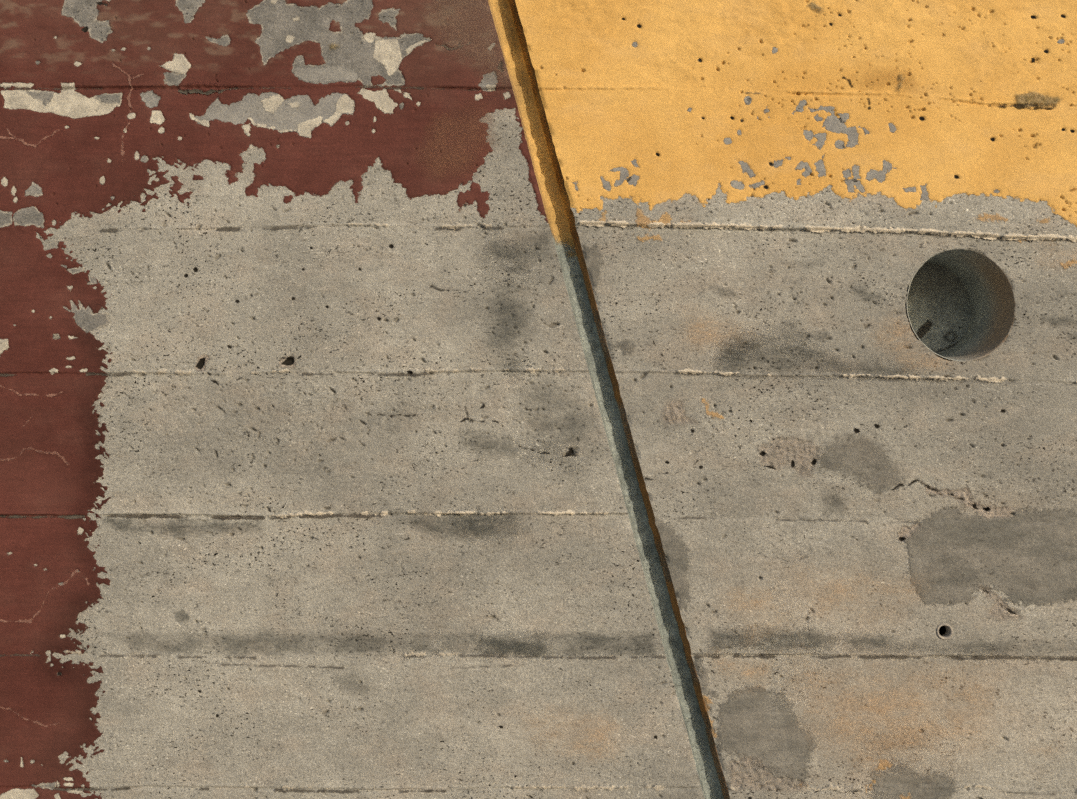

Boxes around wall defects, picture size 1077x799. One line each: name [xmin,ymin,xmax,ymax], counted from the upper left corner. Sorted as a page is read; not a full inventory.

peeling [189,0,431,149]
peeling [0,82,135,133]
peeling [774,100,870,185]
peeling [0,177,44,228]
corrosion [553,160,564,188]
corrosion [570,218,600,318]
corrosion [605,353,624,410]
corrosion [631,450,665,560]
crack [892,479,989,511]
crack [0,569,89,623]
corrosion [665,577,710,722]
peeling [0,777,84,799]